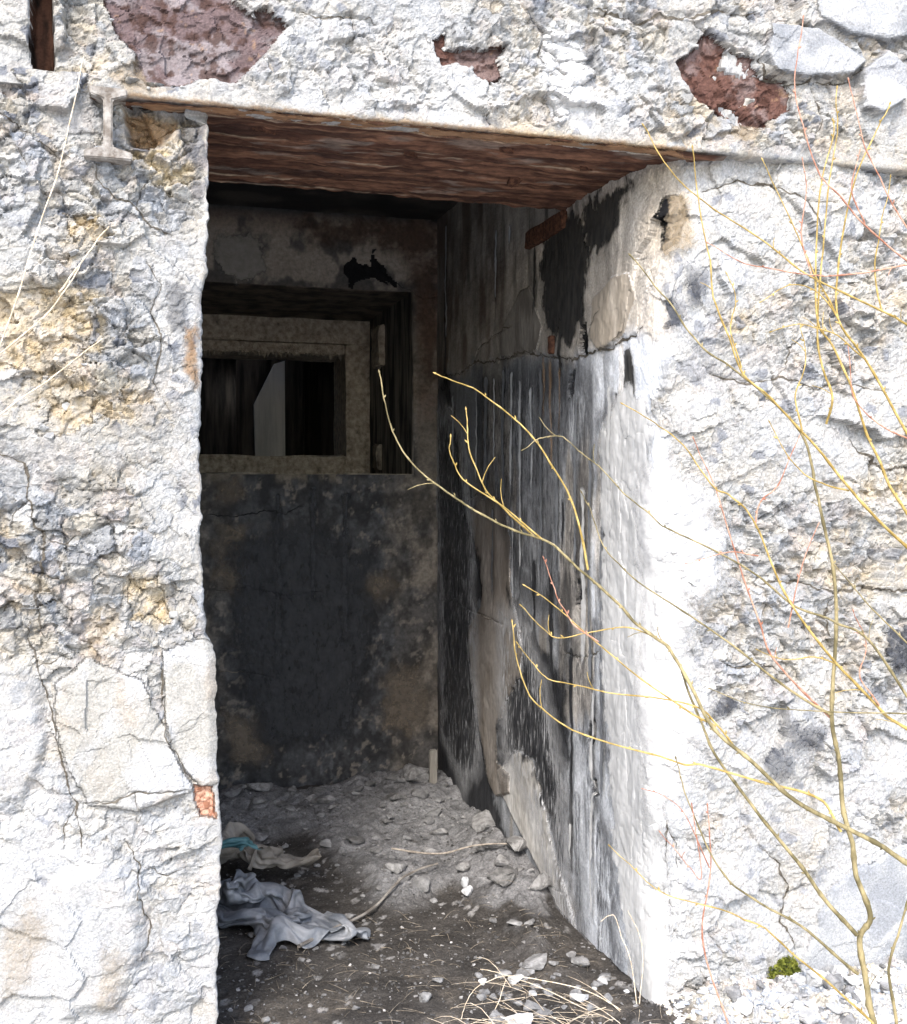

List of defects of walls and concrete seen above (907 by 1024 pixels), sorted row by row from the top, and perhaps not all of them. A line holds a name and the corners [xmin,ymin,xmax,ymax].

spalling [103,0,288,90]
spalling [427,32,508,87]
spalling [676,22,866,130]
spalling [653,195,687,251]
water stain [436,177,726,1004]
crack [0,454,194,960]